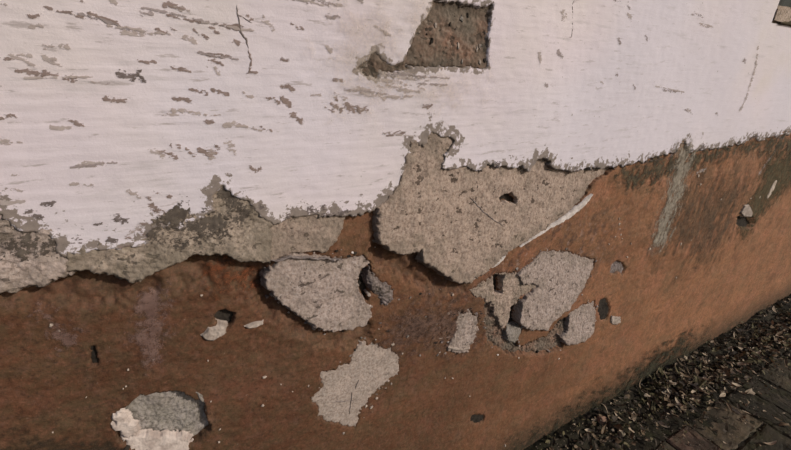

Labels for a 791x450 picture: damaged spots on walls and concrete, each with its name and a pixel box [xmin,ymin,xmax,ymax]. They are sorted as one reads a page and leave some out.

crack [237,9,252,72]
flaking render [357,1,490,79]
peeling [0,185,345,293]
peeling [372,132,608,356]
peeling [360,264,430,306]
hole [200,309,233,341]
flaking render [111,390,209,450]
peeling [310,337,399,435]